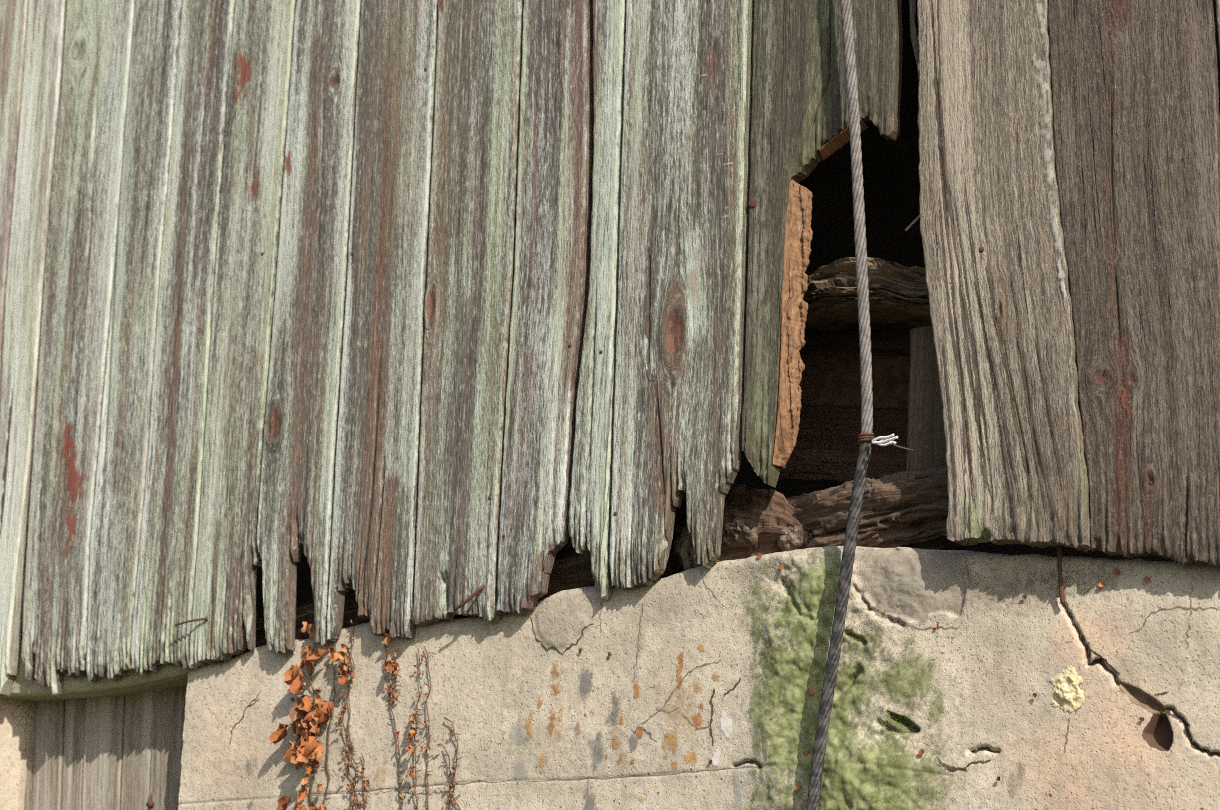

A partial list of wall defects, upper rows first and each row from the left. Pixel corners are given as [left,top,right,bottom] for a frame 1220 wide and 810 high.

peeling [63,423,84,556]
crack [855,587,959,630]
crack [1129,476,1217,649]
crack [306,659,764,797]
corrosion [526,700,559,739]
corrosion [662,652,718,769]
leakage [734,584,777,810]
leakage [866,719,904,810]
leakage [854,635,958,727]
crack [1062,604,1120,753]
spalling [1120,682,1173,751]
crack [1155,691,1220,757]